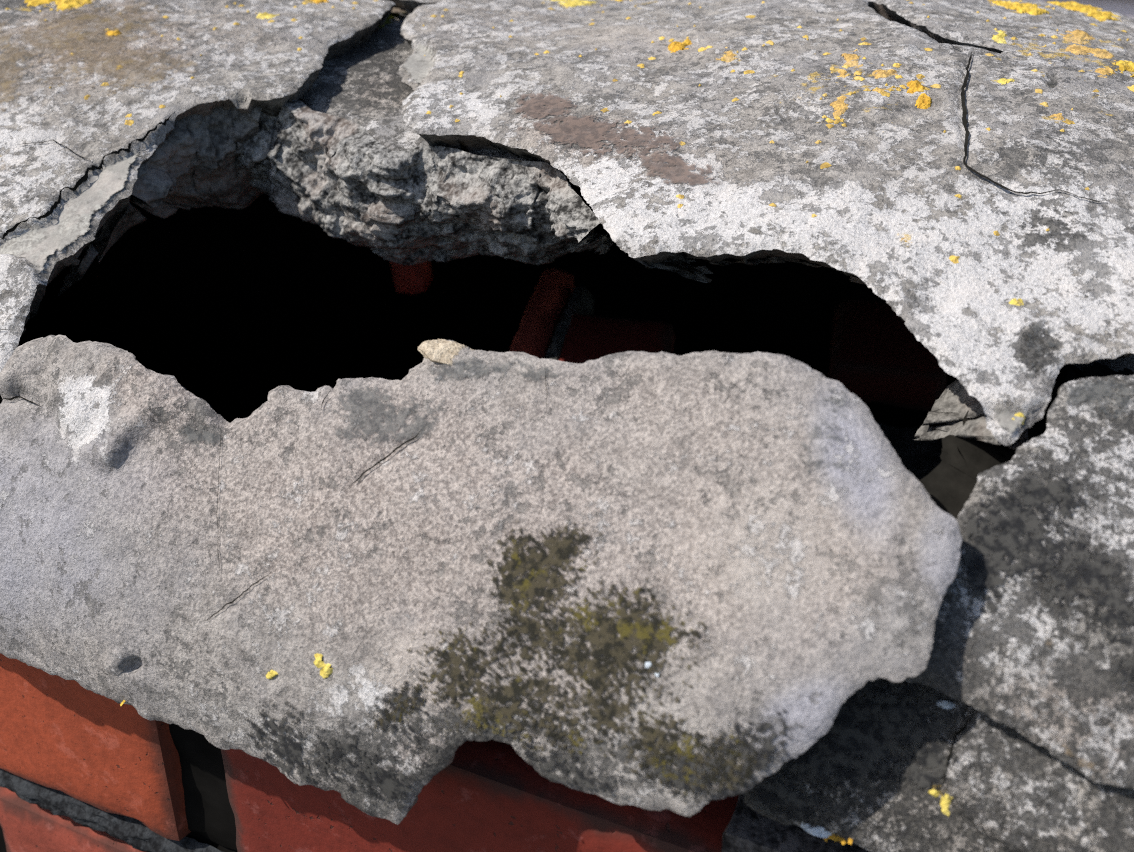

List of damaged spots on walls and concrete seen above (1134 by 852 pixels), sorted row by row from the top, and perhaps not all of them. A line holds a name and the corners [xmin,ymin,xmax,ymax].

crack [0,112,175,239]
spalling [0,12,613,273]
crack [950,43,1105,202]
crack [0,396,40,406]
damp [229,520,962,828]